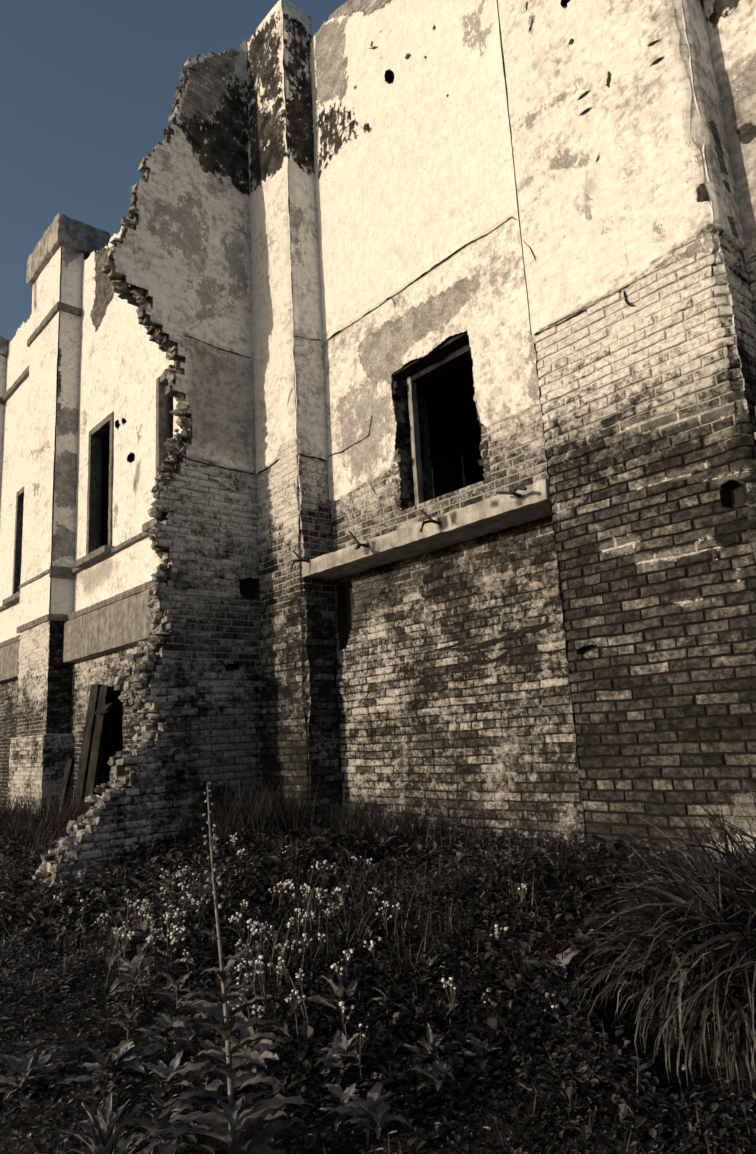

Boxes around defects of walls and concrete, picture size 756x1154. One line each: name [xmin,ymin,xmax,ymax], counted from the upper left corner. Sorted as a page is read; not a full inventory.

peeling [700,0,752,28]
spalling [385,69,394,84]
spalling [736,122,756,144]
peeling [337,272,481,485]
spalling [31,0,391,890]
damp [333,575,380,633]